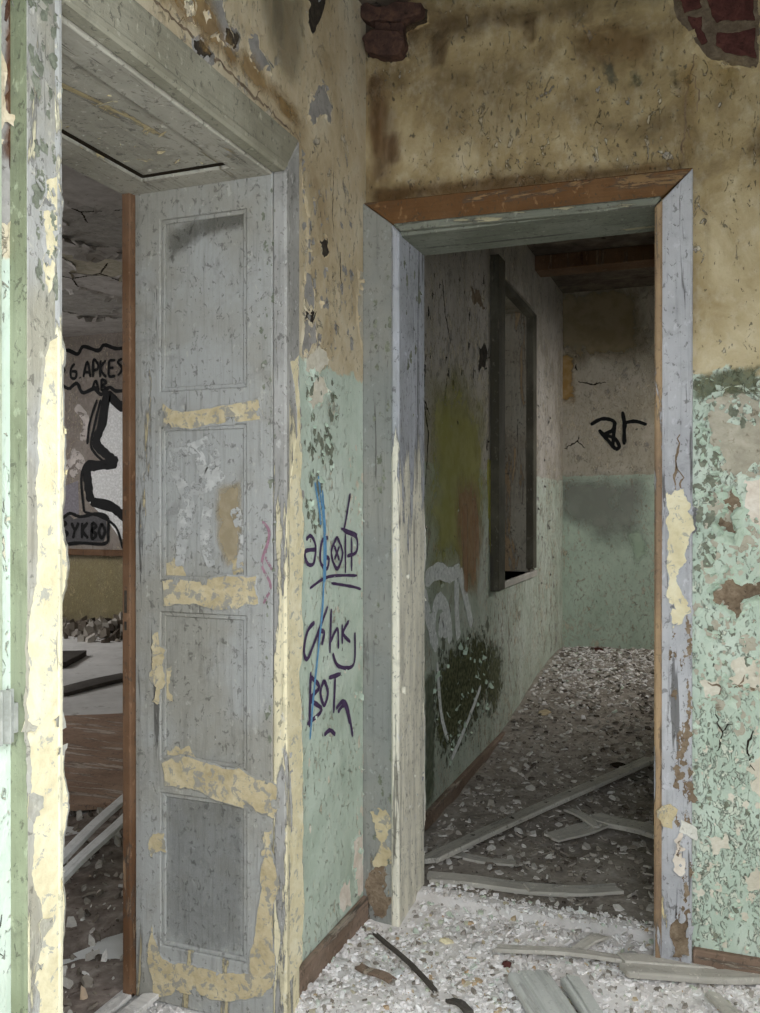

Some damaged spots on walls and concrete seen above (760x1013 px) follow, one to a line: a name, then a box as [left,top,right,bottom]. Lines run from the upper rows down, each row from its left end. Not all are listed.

crack [154,0,194,38]
peeling [183,0,274,76]
flaking render [306,0,326,39]
flaking render [360,1,430,67]
leakage [580,27,648,84]
flaking render [666,0,760,73]
peeling [1,0,15,231]
crack [214,57,299,140]
leakage [375,177,534,201]
peeling [145,144,393,1003]
peeling [21,334,70,1013]
peeling [656,377,760,960]